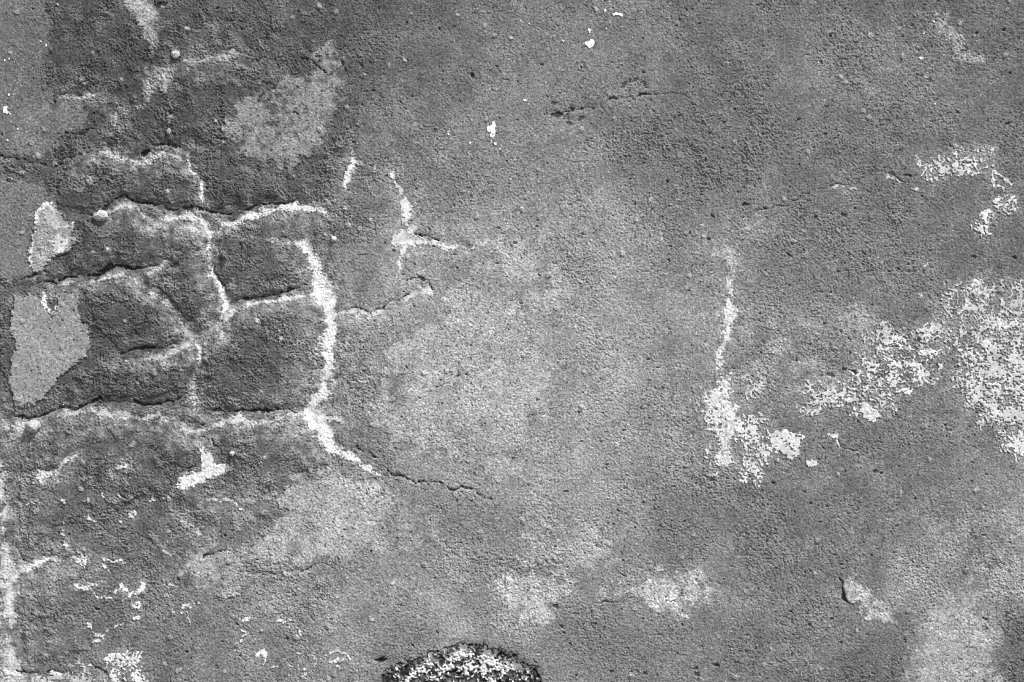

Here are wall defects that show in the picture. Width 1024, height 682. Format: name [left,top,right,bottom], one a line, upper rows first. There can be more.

peeling [27,201,79,272]
peeling [8,291,91,407]
crack [0,92,491,500]
leakage [362,206,572,485]
leakage [695,223,817,487]
leakage [149,438,228,502]
spalling [375,642,541,682]